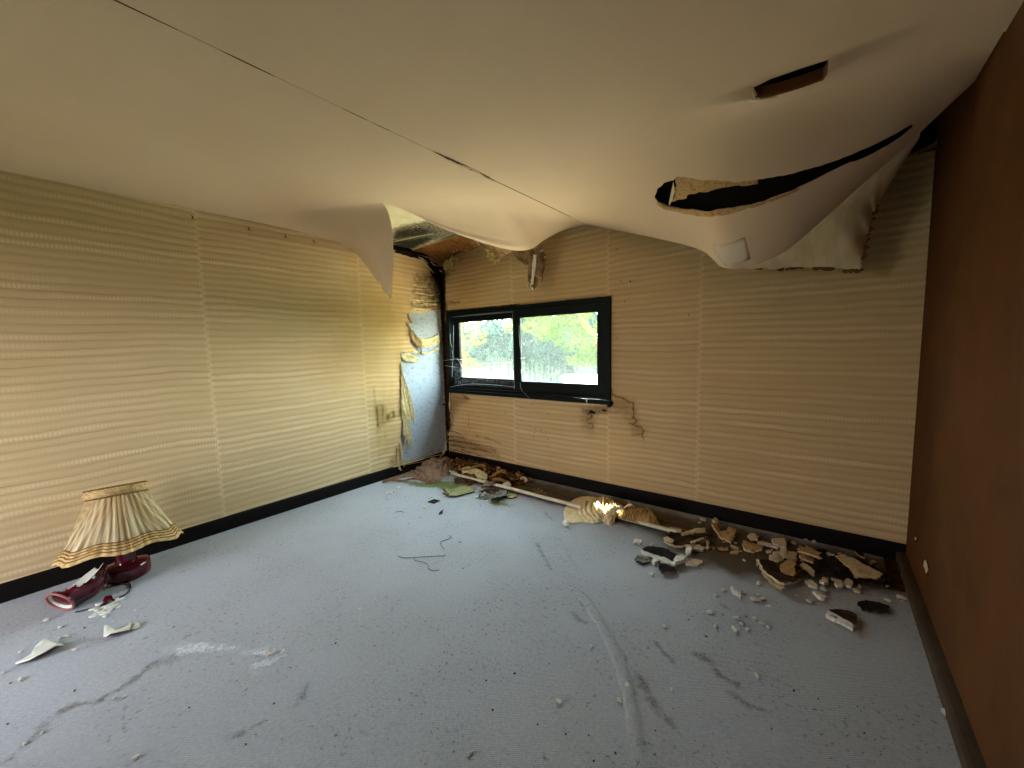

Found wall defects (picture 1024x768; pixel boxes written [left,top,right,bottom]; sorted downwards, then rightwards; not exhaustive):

peeling [390,310,448,471]